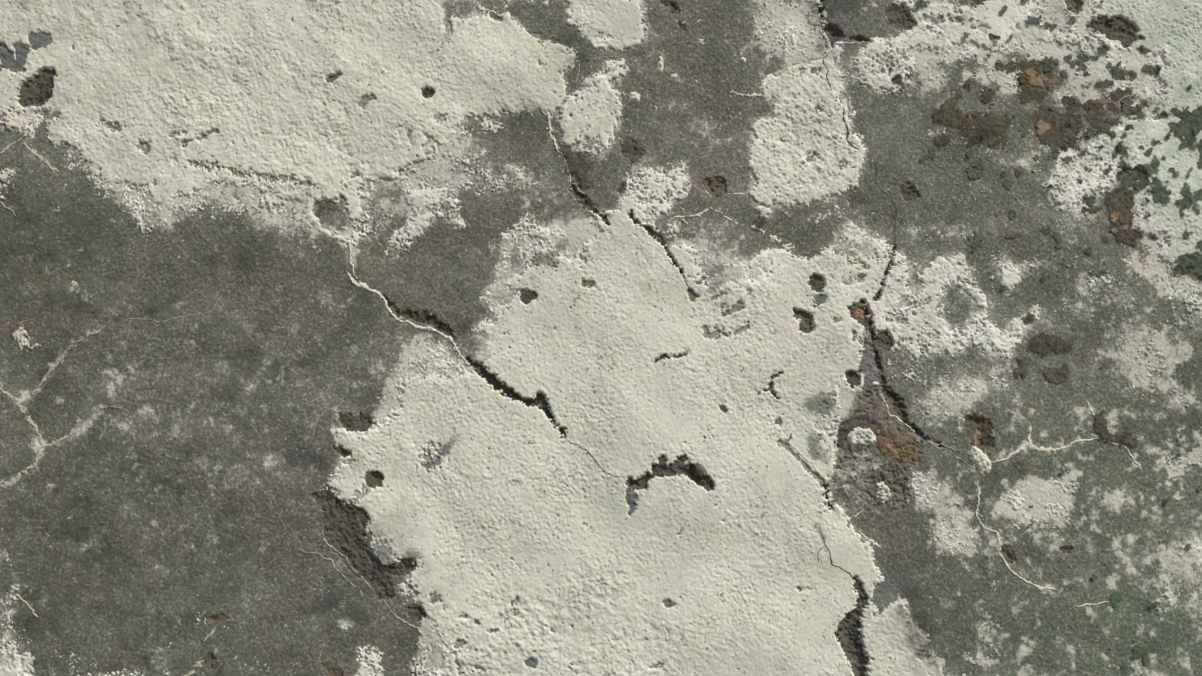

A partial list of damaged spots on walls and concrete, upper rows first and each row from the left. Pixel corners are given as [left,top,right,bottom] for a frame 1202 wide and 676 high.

peeling [0,32,52,73]
spalling [18,69,56,107]
leakage [889,67,922,94]
corrosion [995,55,1053,104]
corrosion [1037,120,1050,136]
leakage [915,0,1202,282]
crack [810,0,1143,607]
crack [306,219,622,477]
leakage [1013,312,1072,384]
spalling [625,455,716,516]
spalling [311,471,420,600]
crack [777,433,882,676]